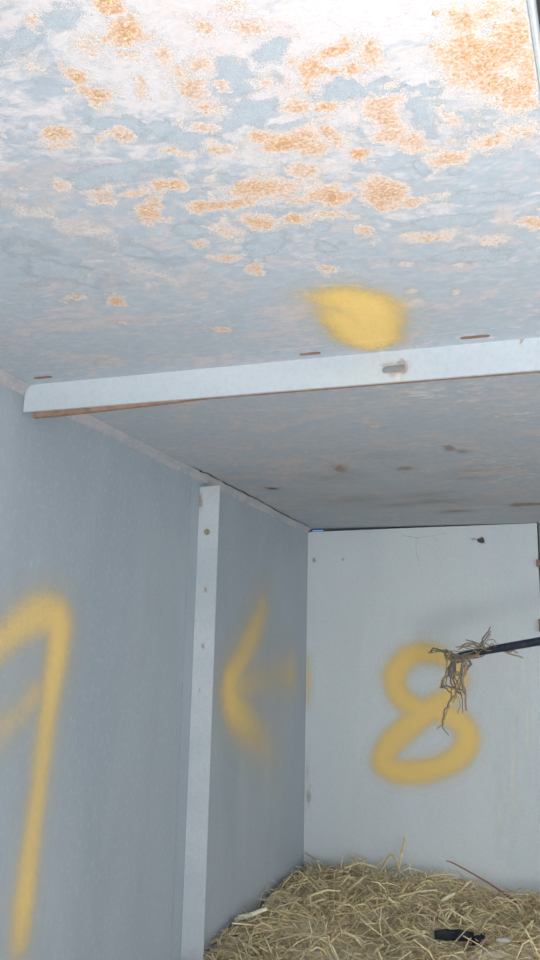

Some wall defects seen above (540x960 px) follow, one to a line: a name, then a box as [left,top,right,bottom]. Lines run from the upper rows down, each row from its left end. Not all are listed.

rust [8,0,540,278]